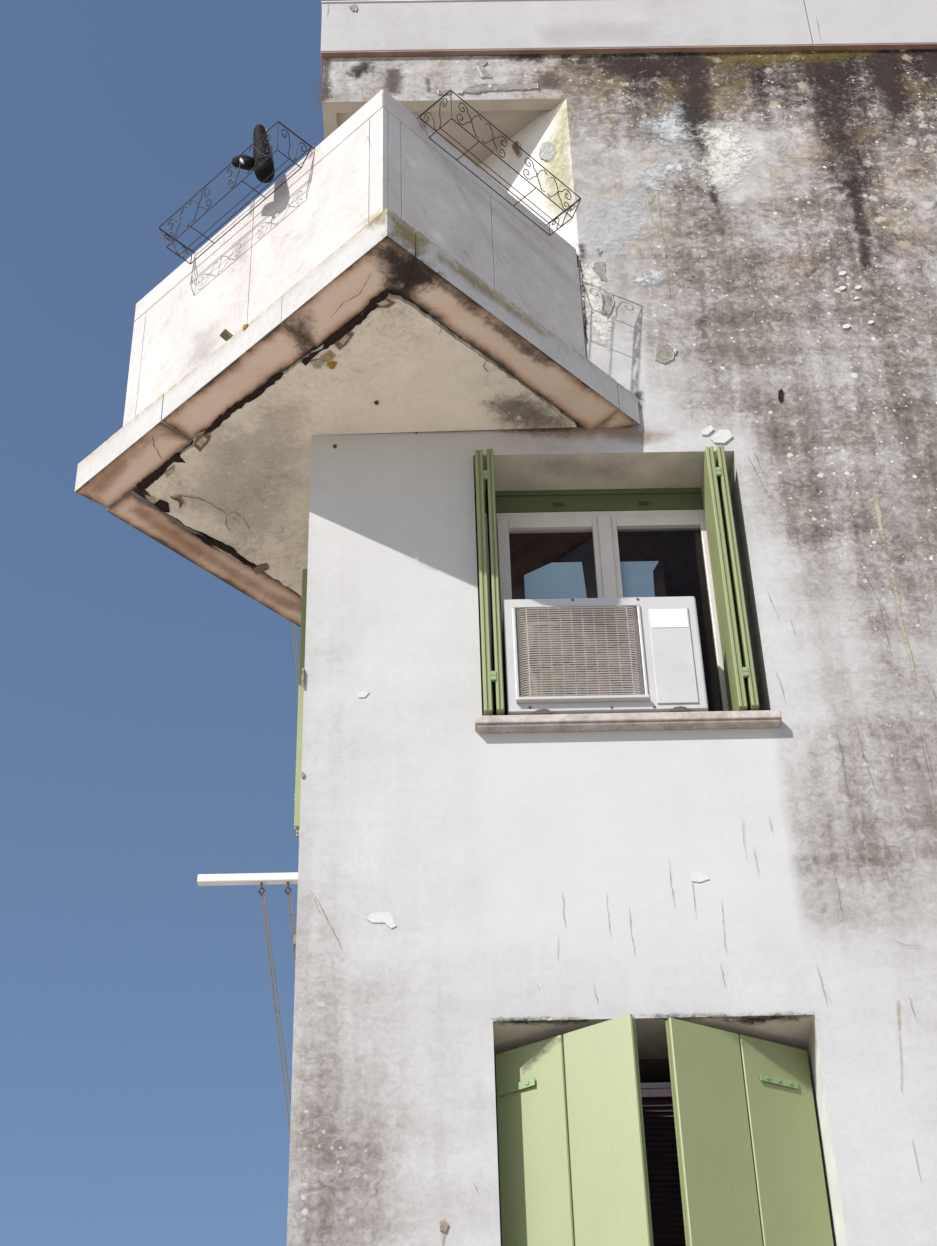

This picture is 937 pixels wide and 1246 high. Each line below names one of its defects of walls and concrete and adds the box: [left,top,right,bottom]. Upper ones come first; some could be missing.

water stain [350,62,402,92]
water stain [865,49,937,118]
water stain [596,52,717,203]
water stain [797,50,870,265]
water stain [287,317,313,360]
flaking render [301,288,396,369]
water stain [376,235,547,365]
flaking render [192,373,283,452]
flaking render [136,453,185,513]
crack [174,494,249,531]
flaking render [193,533,269,574]